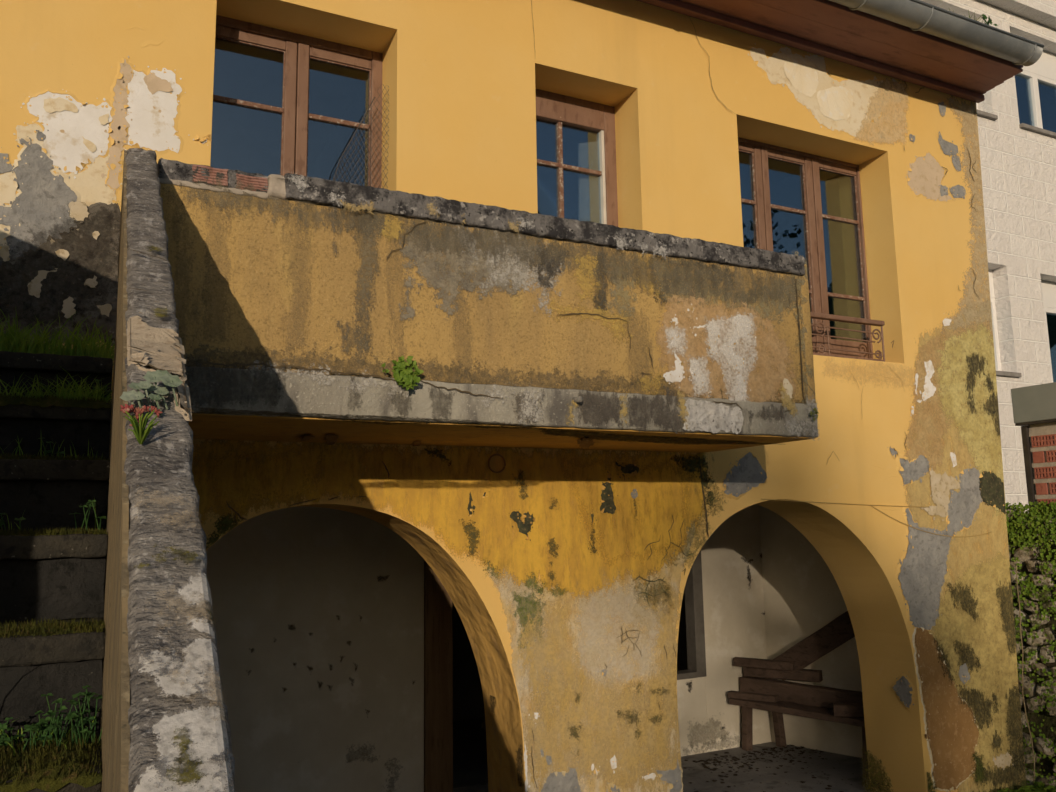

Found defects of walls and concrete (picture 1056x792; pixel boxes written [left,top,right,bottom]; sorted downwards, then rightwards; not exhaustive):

peeling [748,43,904,139]
spalling [0,55,212,265]
peeling [906,131,967,204]
leakage [0,200,121,346]
crack [559,313,654,375]
peeling [661,303,758,434]
peeling [911,360,936,415]
mould [965,352,1001,438]
leakage [180,178,815,792]
spalling [721,450,768,500]
peeling [887,446,983,792]
spalling [524,744,590,792]